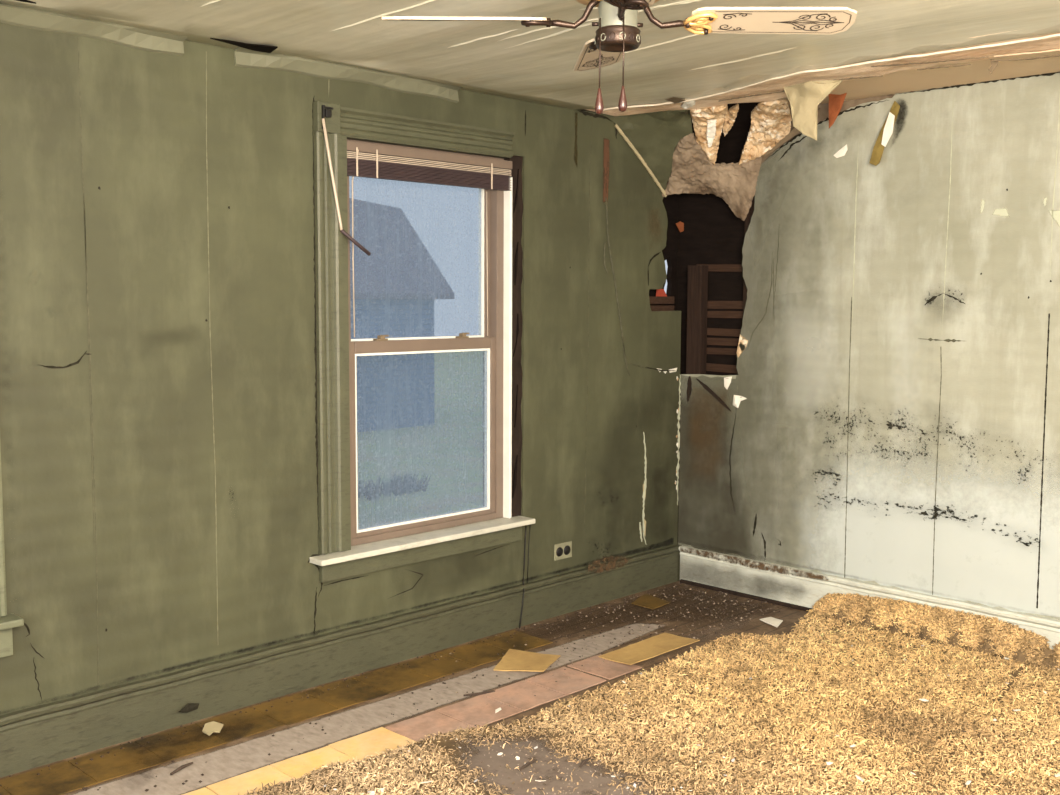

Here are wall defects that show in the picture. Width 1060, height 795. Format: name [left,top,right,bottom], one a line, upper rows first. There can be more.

spalling [817,94,895,124]
crack [41,351,90,368]
spalling [649,98,801,521]
peeling [639,432,647,545]
peeling [677,537,828,580]
leakage [812,406,1060,617]